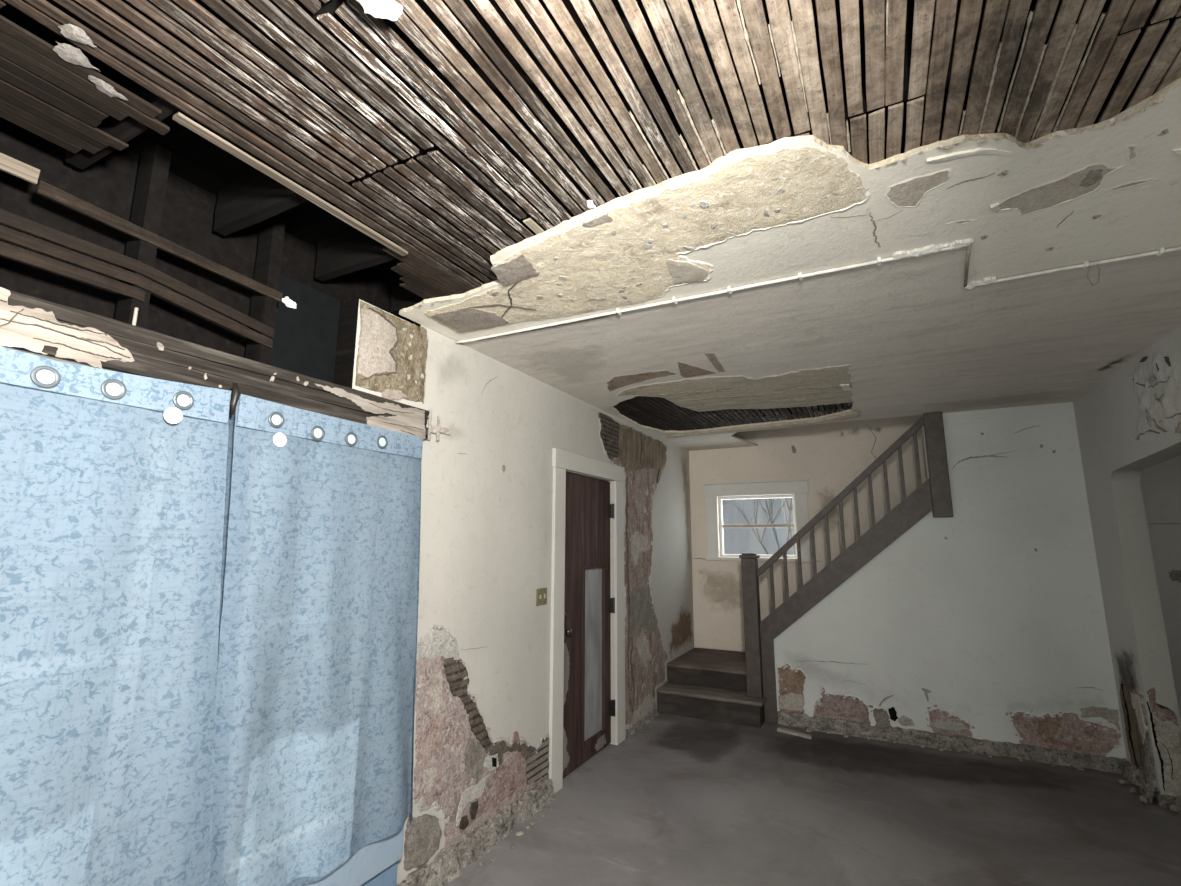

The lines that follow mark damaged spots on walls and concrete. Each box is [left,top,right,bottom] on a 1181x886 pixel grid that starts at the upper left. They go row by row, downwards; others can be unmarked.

peeling [0,287,135,369]
spalling [296,146,1014,439]
peeling [991,144,1158,216]
spalling [598,412,669,726]
spalling [413,624,550,852]
spalling [776,662,975,738]